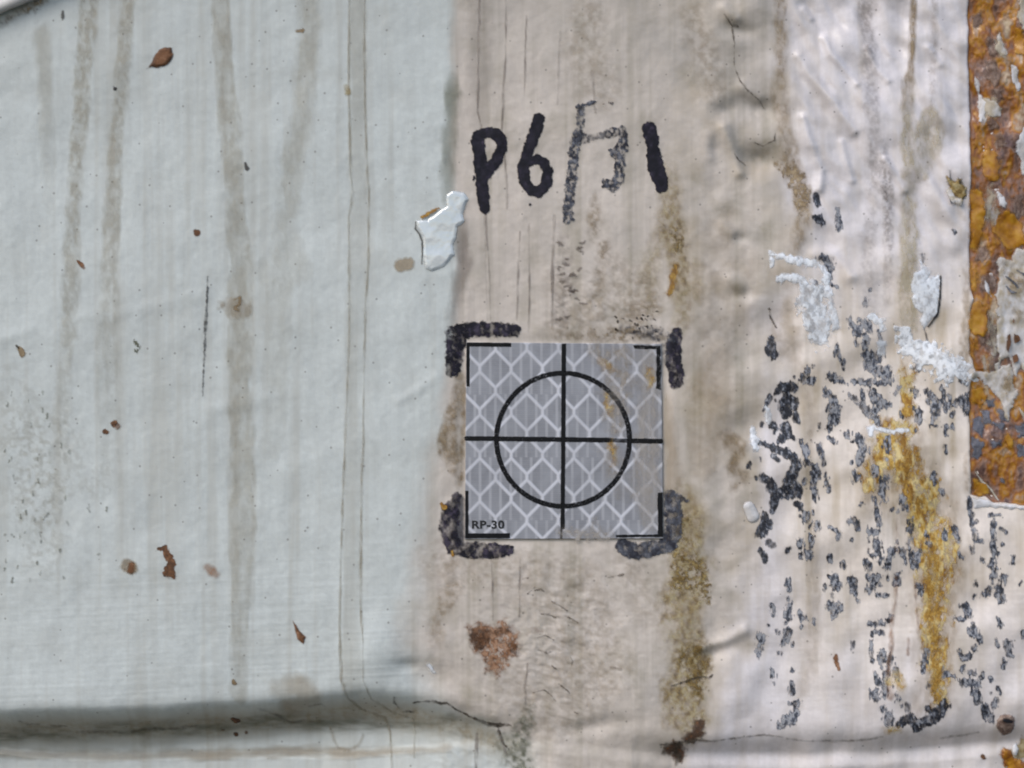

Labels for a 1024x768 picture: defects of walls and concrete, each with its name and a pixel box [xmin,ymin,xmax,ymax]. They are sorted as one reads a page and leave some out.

peeling [414,191,468,271]
rust [946,0,1024,505]
rust [157,545,176,579]
rust [467,621,518,675]
peeling [746,250,1024,733]
rust [858,367,959,708]